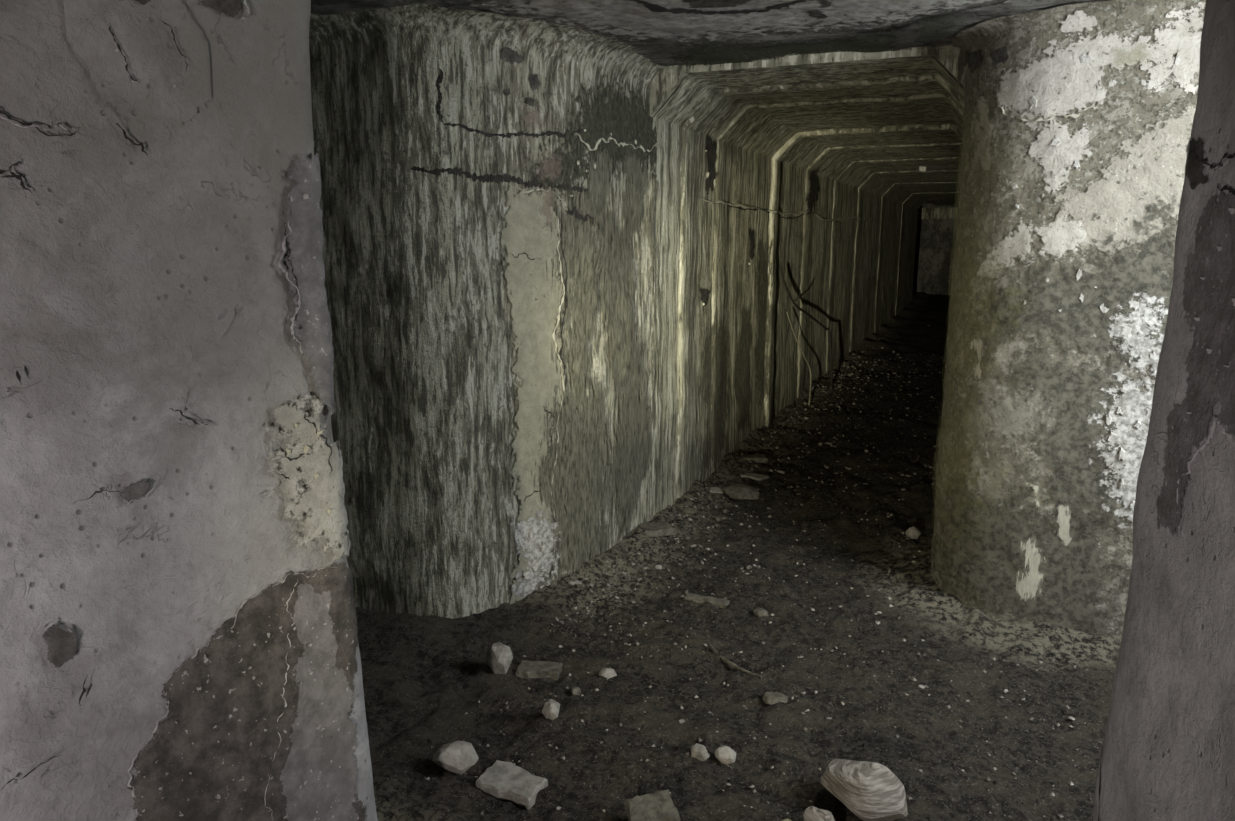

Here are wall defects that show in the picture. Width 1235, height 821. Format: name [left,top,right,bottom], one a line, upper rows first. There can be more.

peeling [471,0,1030,46]
crack [0,161,32,193]
crack [0,111,79,136]
crack [116,123,148,156]
crack [410,166,604,200]
crack [436,68,658,152]
spalling [705,135,719,195]
spalling [805,168,820,217]
flaking render [970,0,1235,535]
flaking render [498,187,594,604]
damp [931,196,1180,642]
spalling [127,153,367,821]